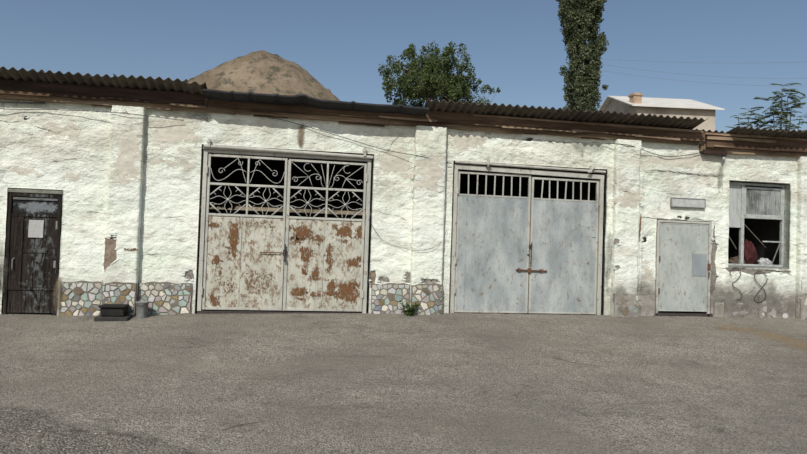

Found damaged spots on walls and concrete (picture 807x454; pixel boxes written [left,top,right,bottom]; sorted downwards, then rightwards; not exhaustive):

flaking render [103,232,117,270]
rust [208,220,276,306]
rust [285,224,362,304]